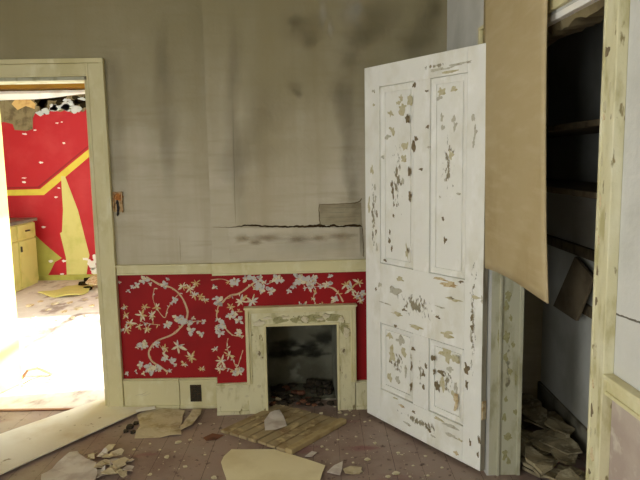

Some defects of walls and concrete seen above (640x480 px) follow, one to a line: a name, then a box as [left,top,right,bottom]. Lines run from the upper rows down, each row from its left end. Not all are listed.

peeling [425,60,472,74]
spalling [0,89,86,135]
peeling [387,94,413,123]
crack [216,81,364,257]
peeling [390,136,418,217]
peeling [433,277,463,288]
peeling [379,297,440,319]
peeling [470,278,483,348]
peeling [386,325,472,411]
peeling [403,410,436,438]
peeling [435,416,481,446]